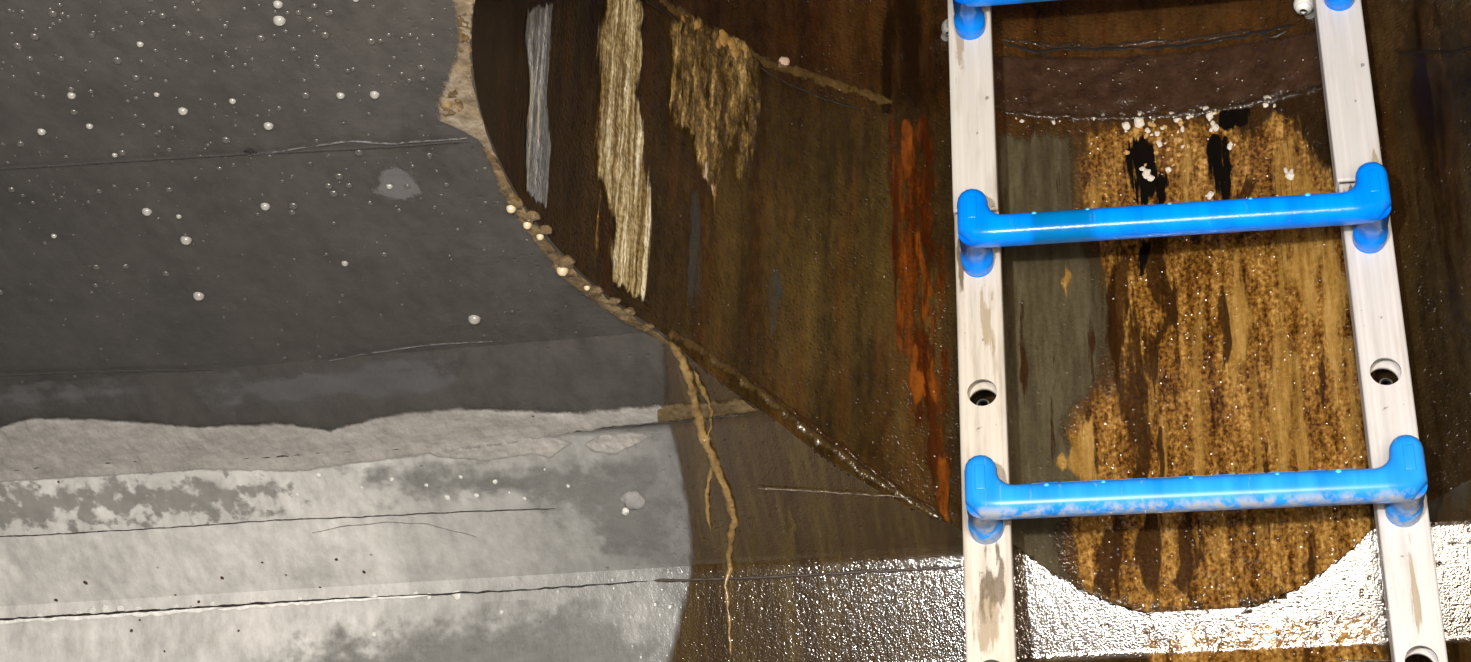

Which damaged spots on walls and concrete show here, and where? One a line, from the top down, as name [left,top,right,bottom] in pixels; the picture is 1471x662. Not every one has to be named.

water stain [374,166,421,200]
water stain [998,95,1336,214]
water stain [438,0,966,662]
rust [888,117,953,522]
water stain [1002,226,1374,485]
water stain [324,610,637,662]
water stain [360,464,667,553]
water stain [1012,490,1471,662]